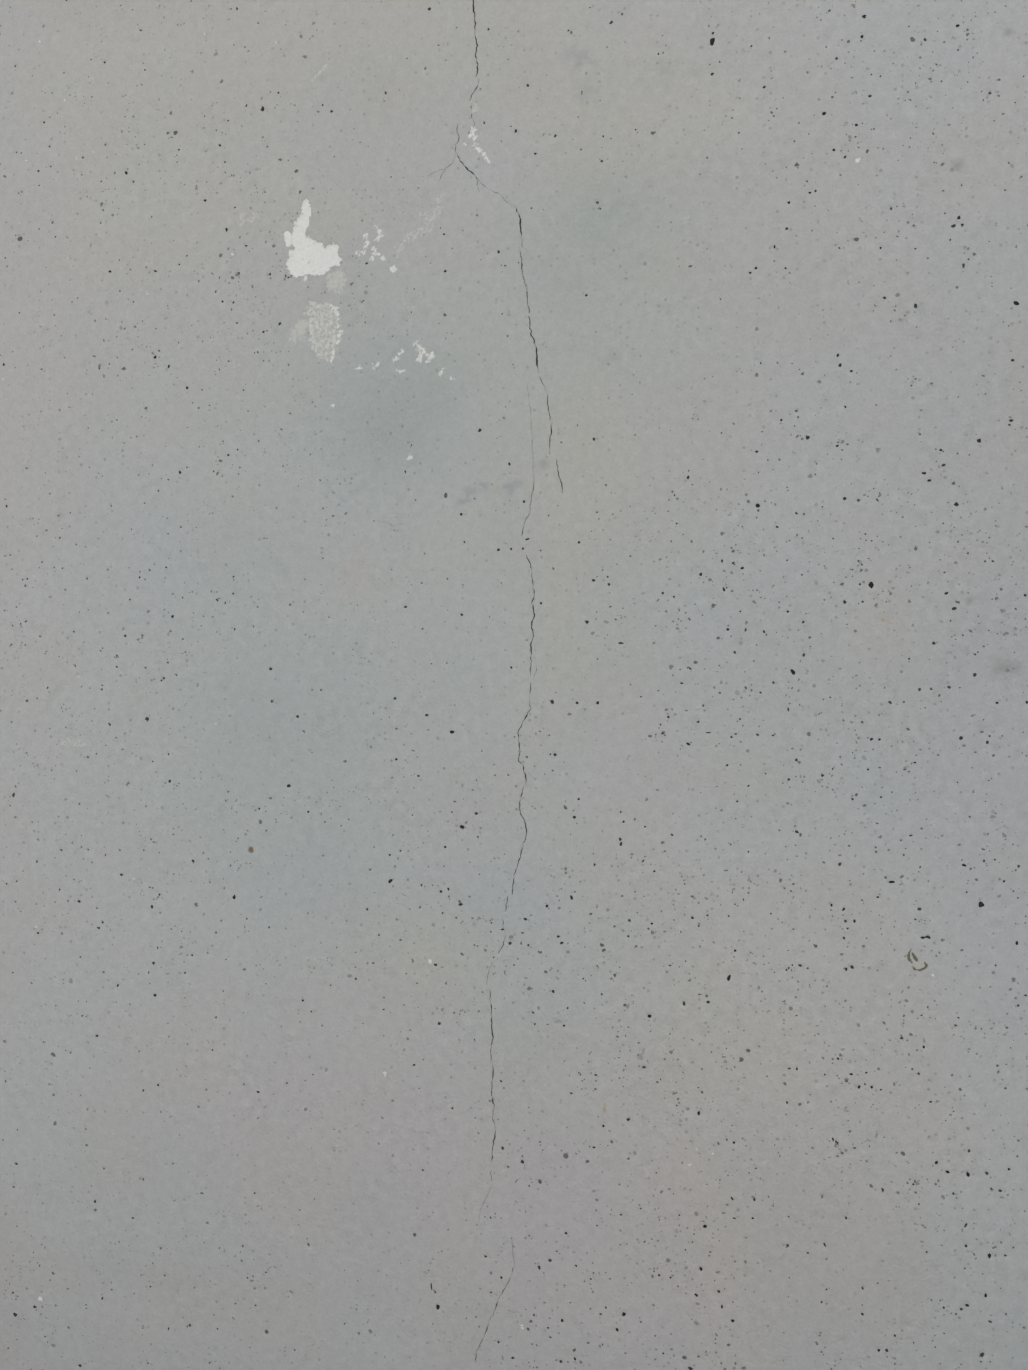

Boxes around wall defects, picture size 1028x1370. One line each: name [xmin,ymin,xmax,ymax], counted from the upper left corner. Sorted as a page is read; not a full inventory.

peeling [282,197,399,364]
crack [439,0,563,1206]